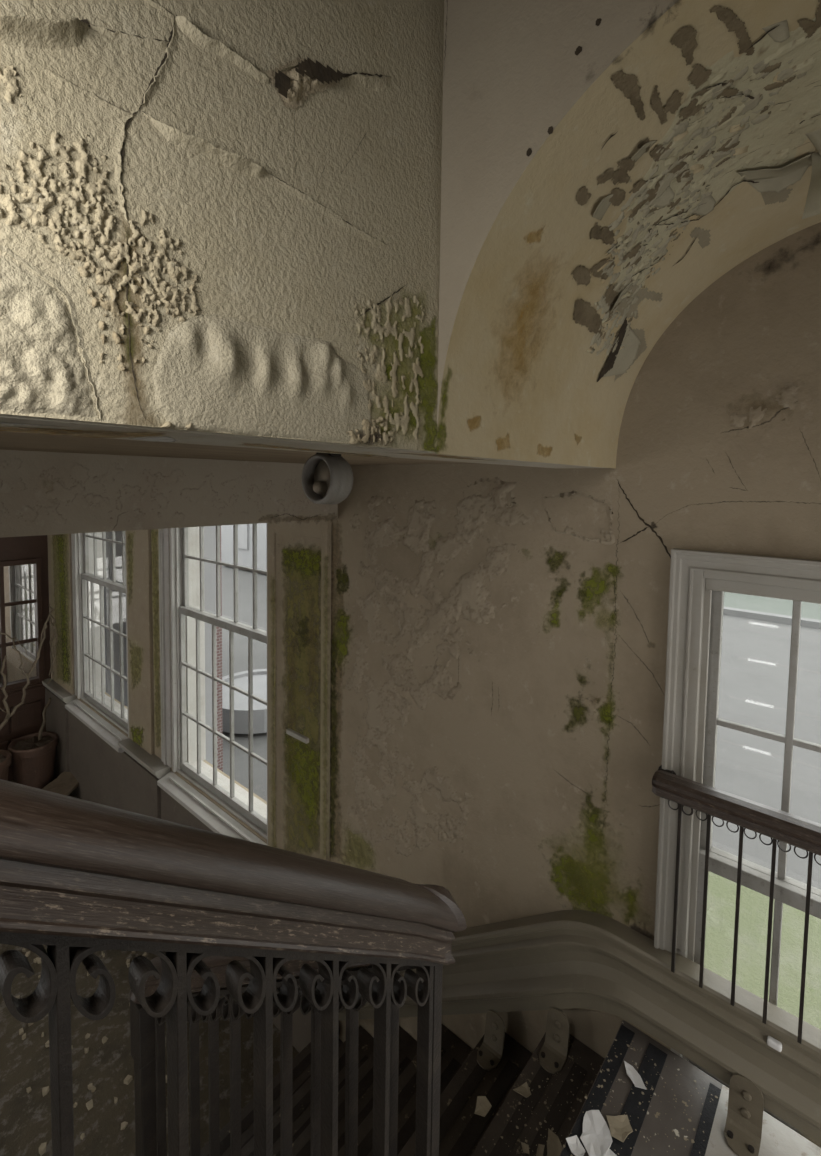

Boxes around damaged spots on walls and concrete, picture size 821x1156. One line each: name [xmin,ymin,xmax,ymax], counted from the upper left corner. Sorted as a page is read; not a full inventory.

crack [0,0,387,424]
flaking render [264,57,393,110]
peeling [571,0,821,382]
crack [618,481,821,559]